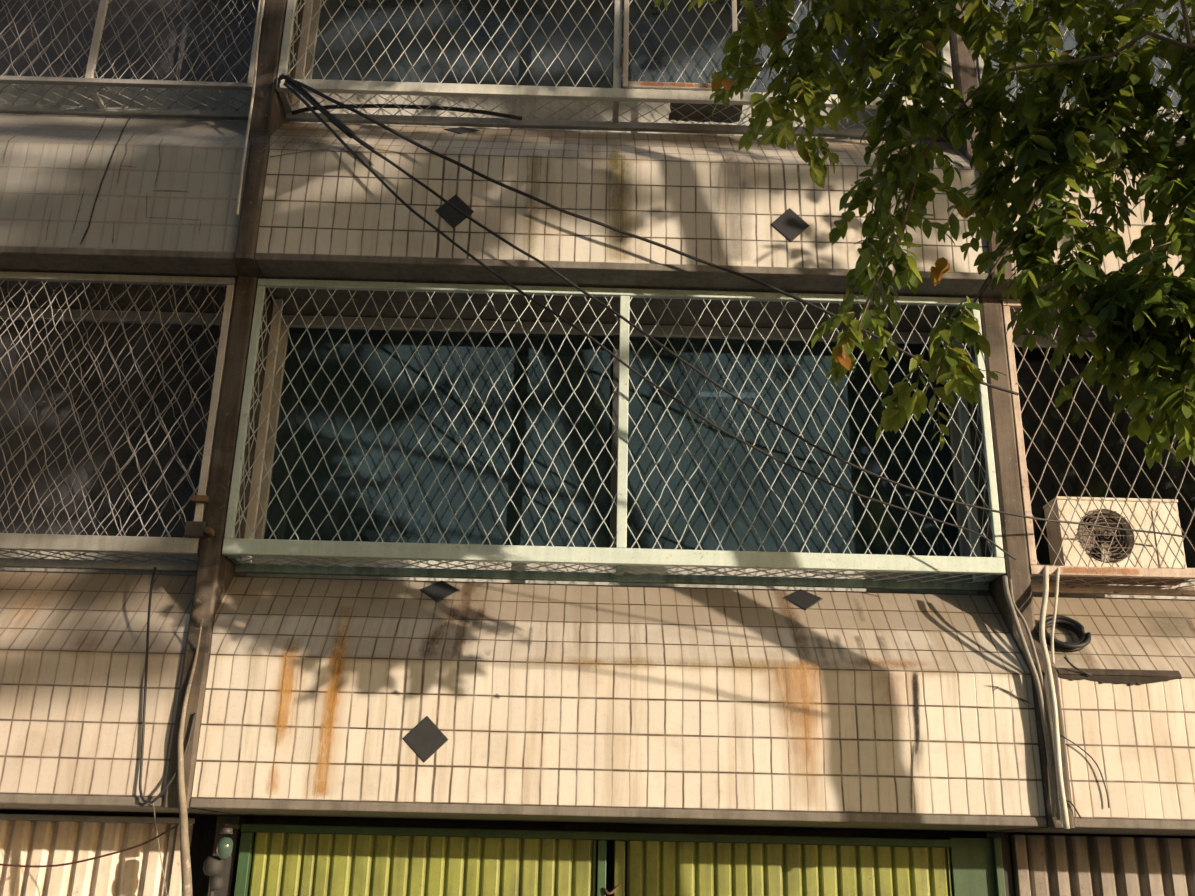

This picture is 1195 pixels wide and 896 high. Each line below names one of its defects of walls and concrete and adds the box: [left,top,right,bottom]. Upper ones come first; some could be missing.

crack [46,118,201,244]
corrosion [319,646,342,792]